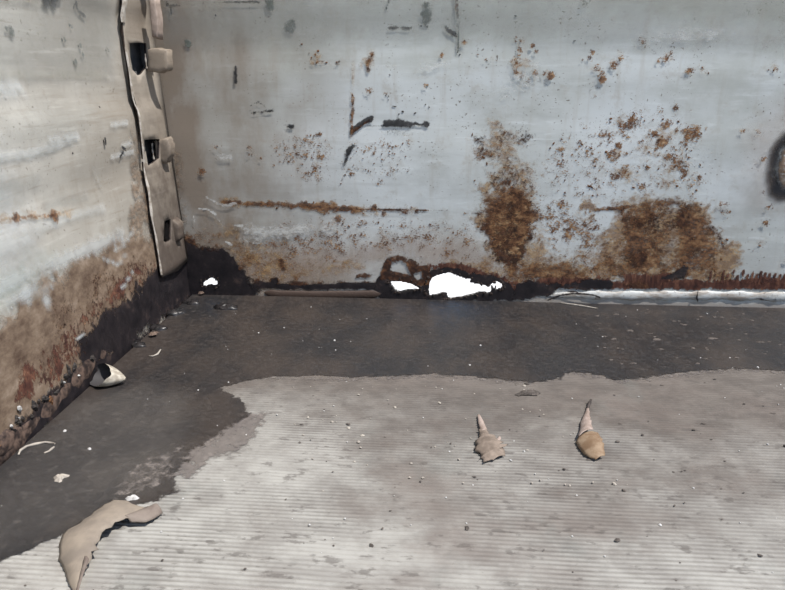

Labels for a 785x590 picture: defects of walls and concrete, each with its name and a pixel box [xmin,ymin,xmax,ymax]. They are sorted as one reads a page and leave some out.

rust [5,209,68,223]
rust [188,106,785,300]
peeling [386,271,506,300]
rust [0,350,110,464]
leakage [0,295,785,561]